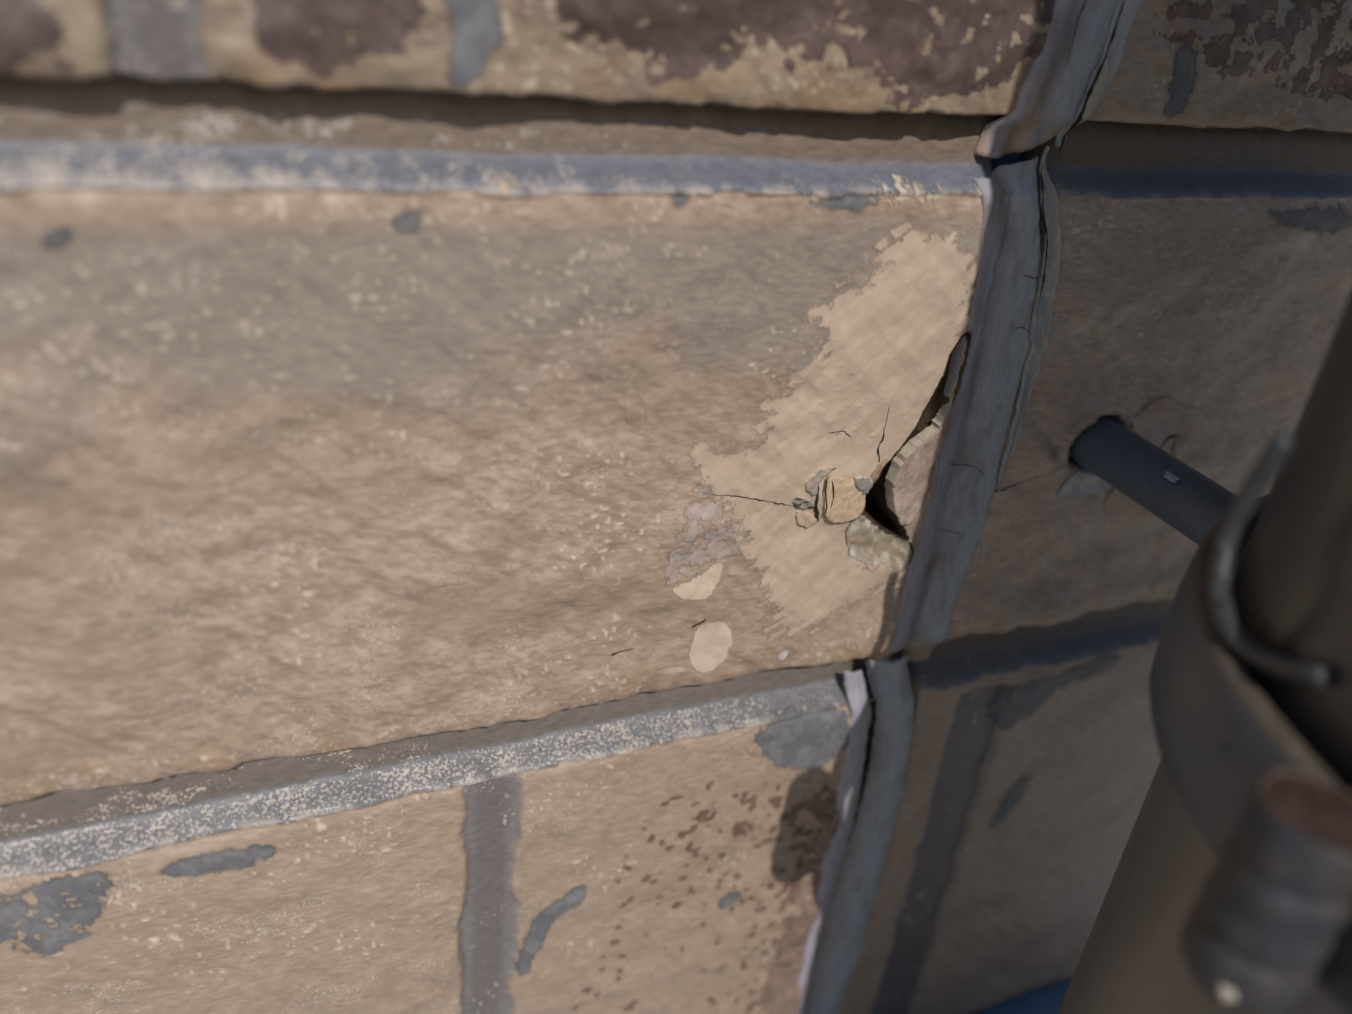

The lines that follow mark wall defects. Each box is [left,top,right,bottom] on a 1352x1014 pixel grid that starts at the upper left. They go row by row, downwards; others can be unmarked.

peeling [0,0,71,75]
peeling [253,0,427,79]
peeling [446,0,503,87]
peeling [557,0,1055,112]
peeling [1153,0,1352,117]
peeling [664,222,979,660]
crack [705,333,1066,567]